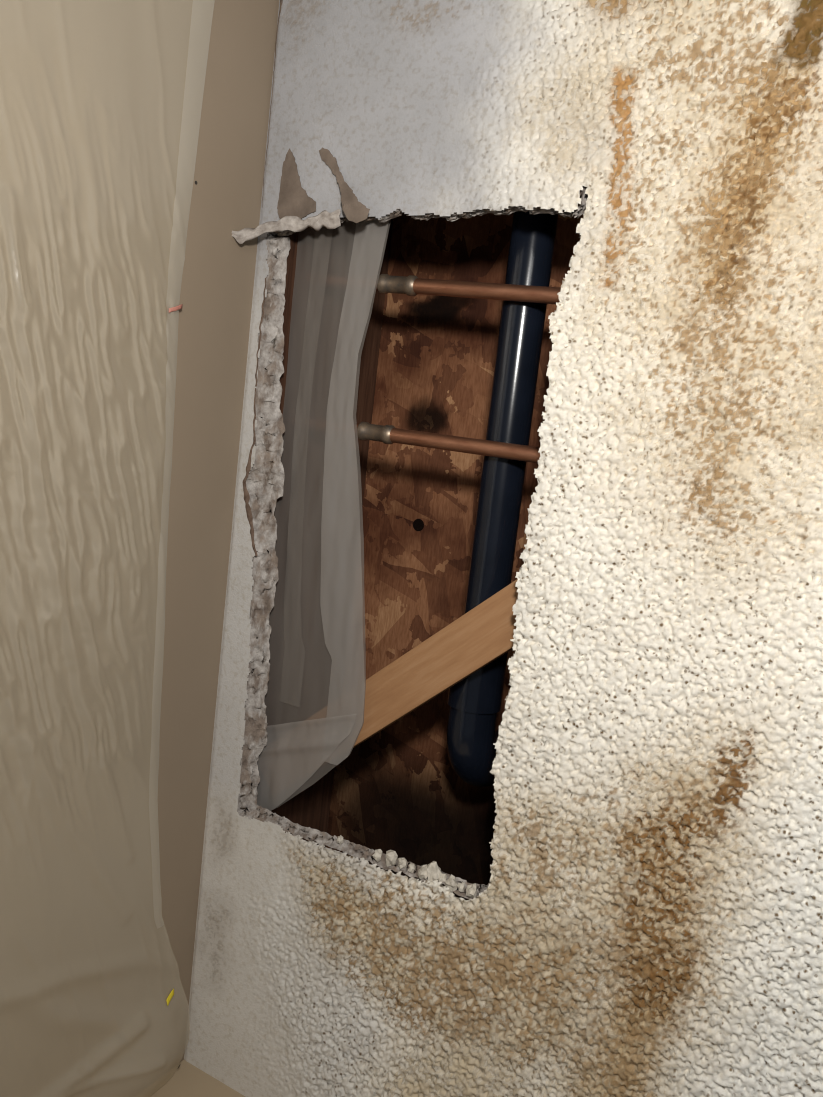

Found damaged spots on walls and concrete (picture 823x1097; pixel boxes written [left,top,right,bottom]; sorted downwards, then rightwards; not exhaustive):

damp [587,0,641,18]
spalling [365,187,588,223]
damp [600,0,823,545]
spalling [237,230,491,900]
damp [297,740,754,1097]